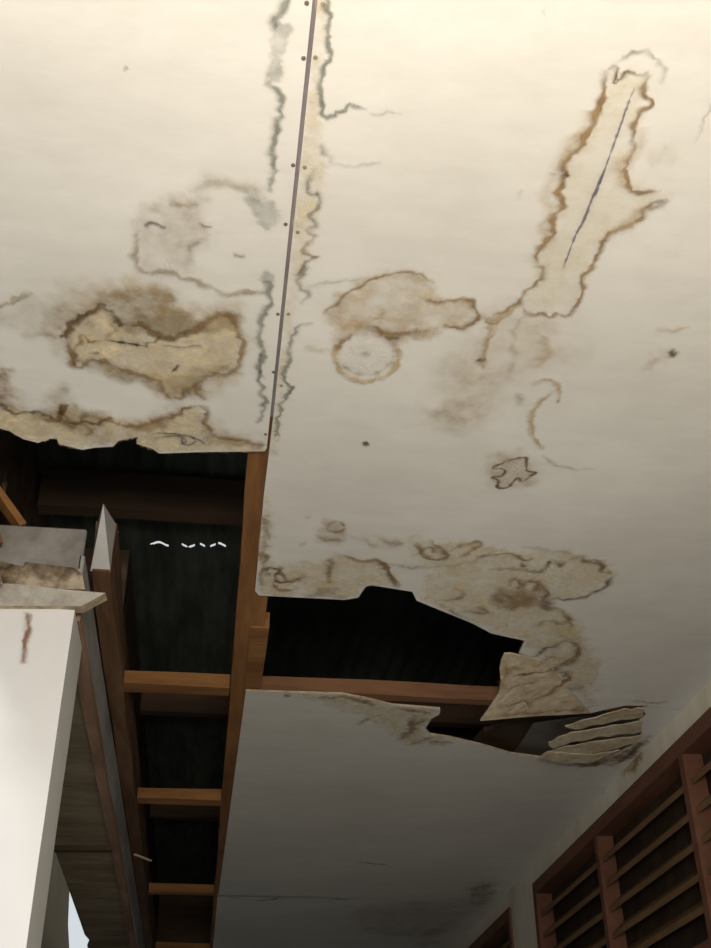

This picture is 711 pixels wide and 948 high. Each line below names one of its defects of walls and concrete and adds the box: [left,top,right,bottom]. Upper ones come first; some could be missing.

leakage [272,0,290,22]
leakage [318,0,360,119]
leakage [270,86,285,184]
leakage [530,70,658,317]
leakage [132,243,207,287]
leakage [0,282,298,451]
leakage [333,323,376,383]
leakage [431,299,521,347]
leakage [491,457,537,489]